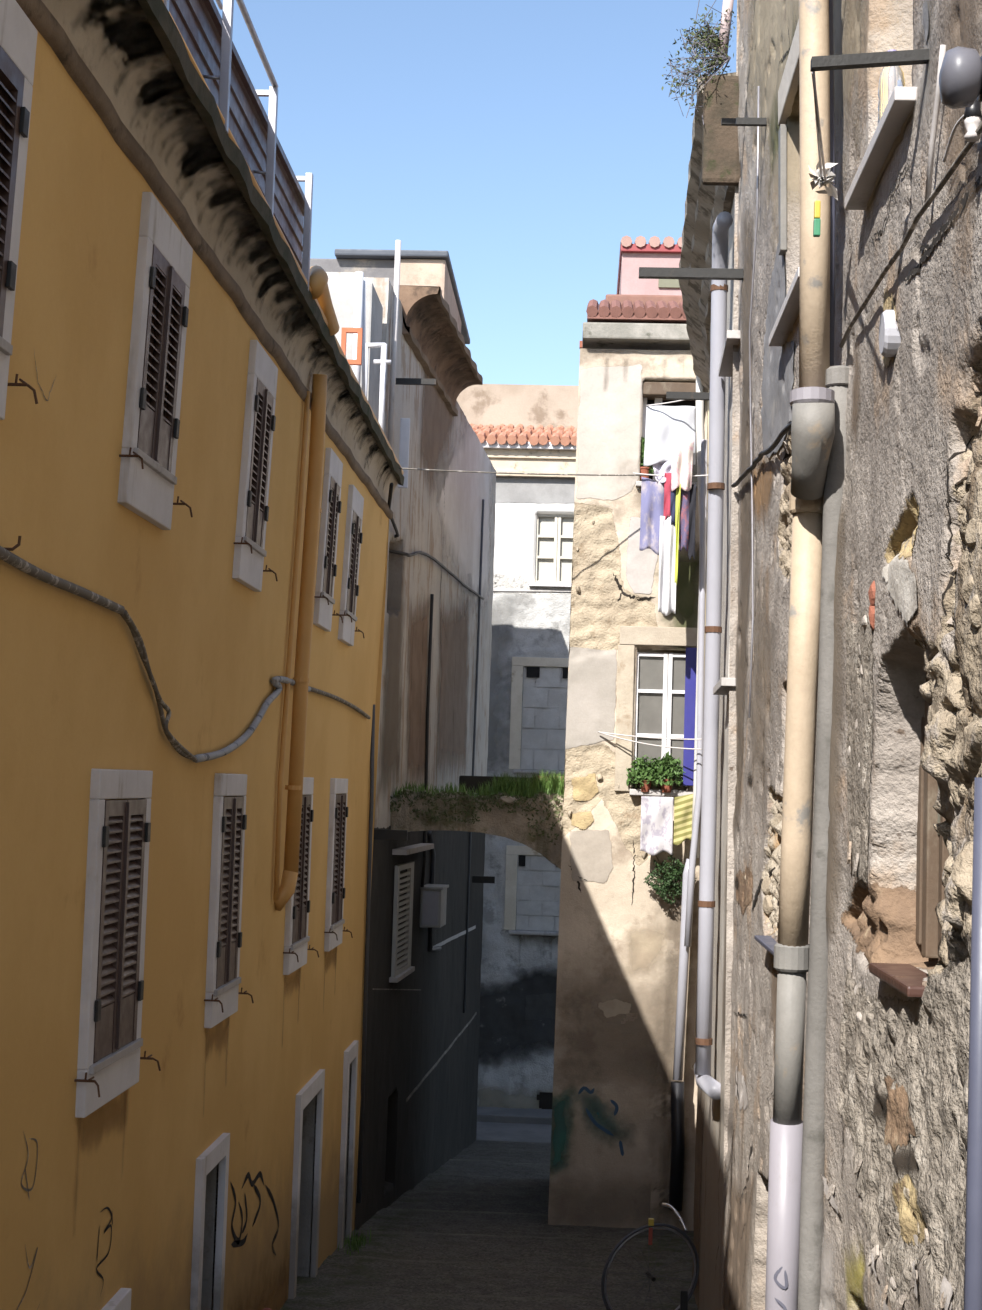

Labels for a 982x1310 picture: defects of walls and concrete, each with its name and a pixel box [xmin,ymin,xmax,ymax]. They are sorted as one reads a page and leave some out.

crack [870,160,910,241]
crack [904,176,982,281]
flaking render [883,289,897,329]
flaking render [777,430,793,582]
crack [940,430,974,623]
flaking render [734,785,783,936]
flaking render [836,359,982,1310]